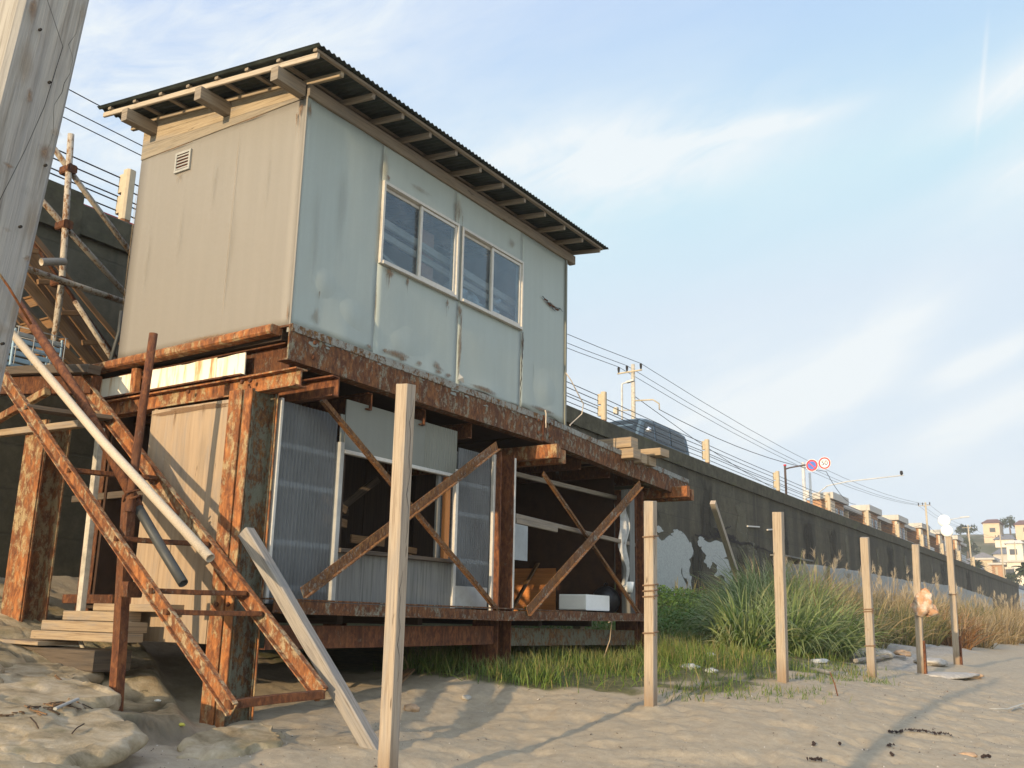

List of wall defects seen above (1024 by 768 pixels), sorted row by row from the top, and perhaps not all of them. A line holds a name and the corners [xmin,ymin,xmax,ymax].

peeling [657,526,736,598]